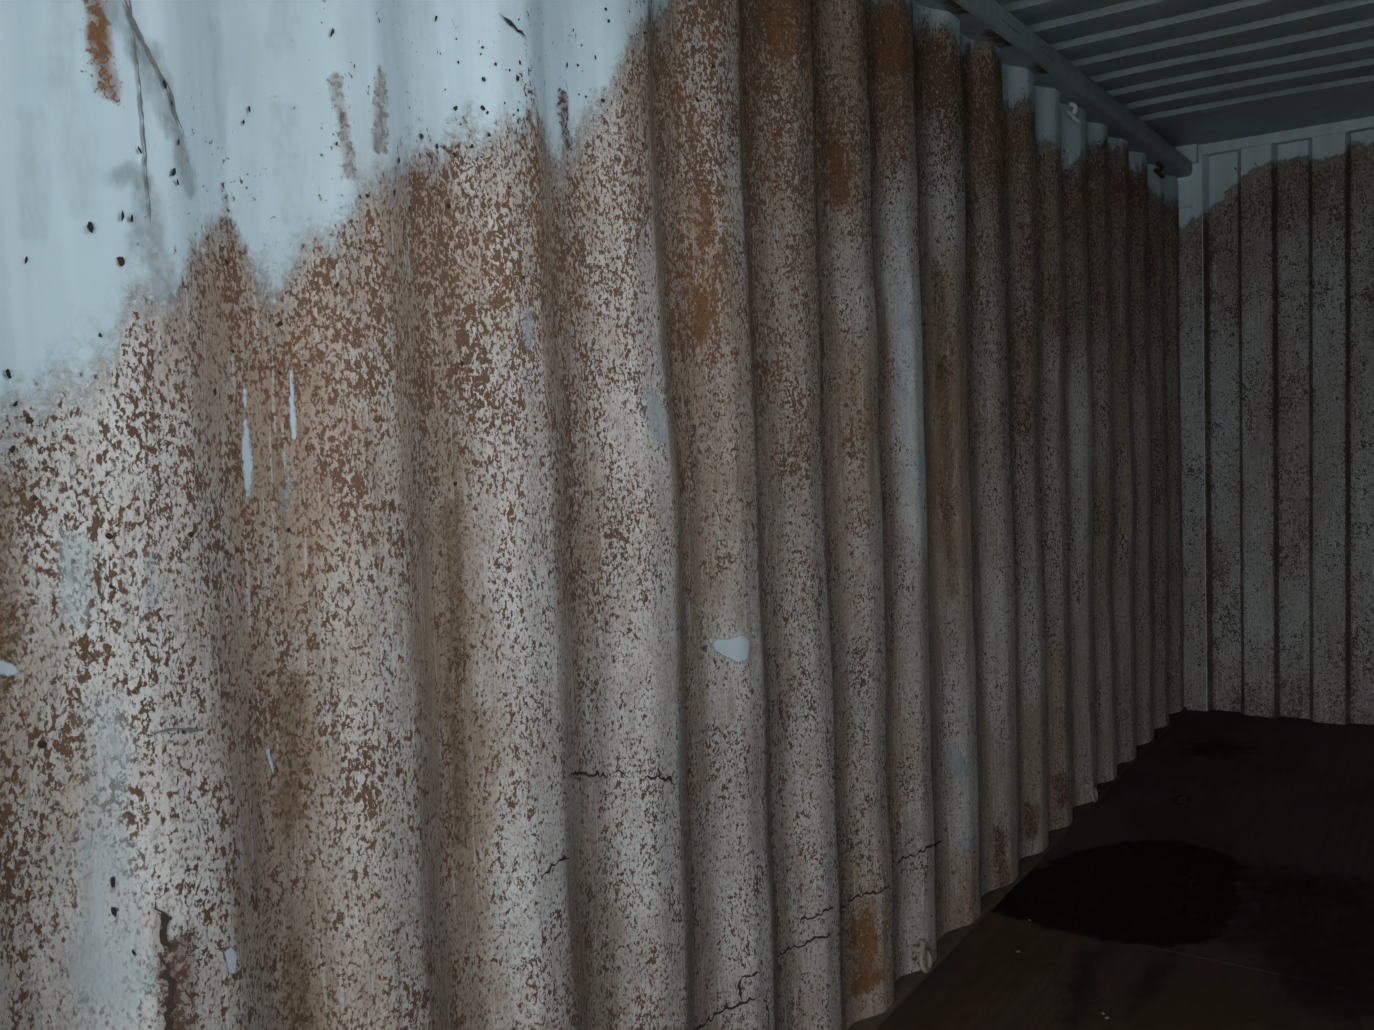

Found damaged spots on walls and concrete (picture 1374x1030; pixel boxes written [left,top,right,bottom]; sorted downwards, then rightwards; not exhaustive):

rust [0,0,1049,1030]
rust [1035,130,1374,832]
crack [571,769,675,785]
crack [695,839,942,1030]
water stain [992,841,1242,947]